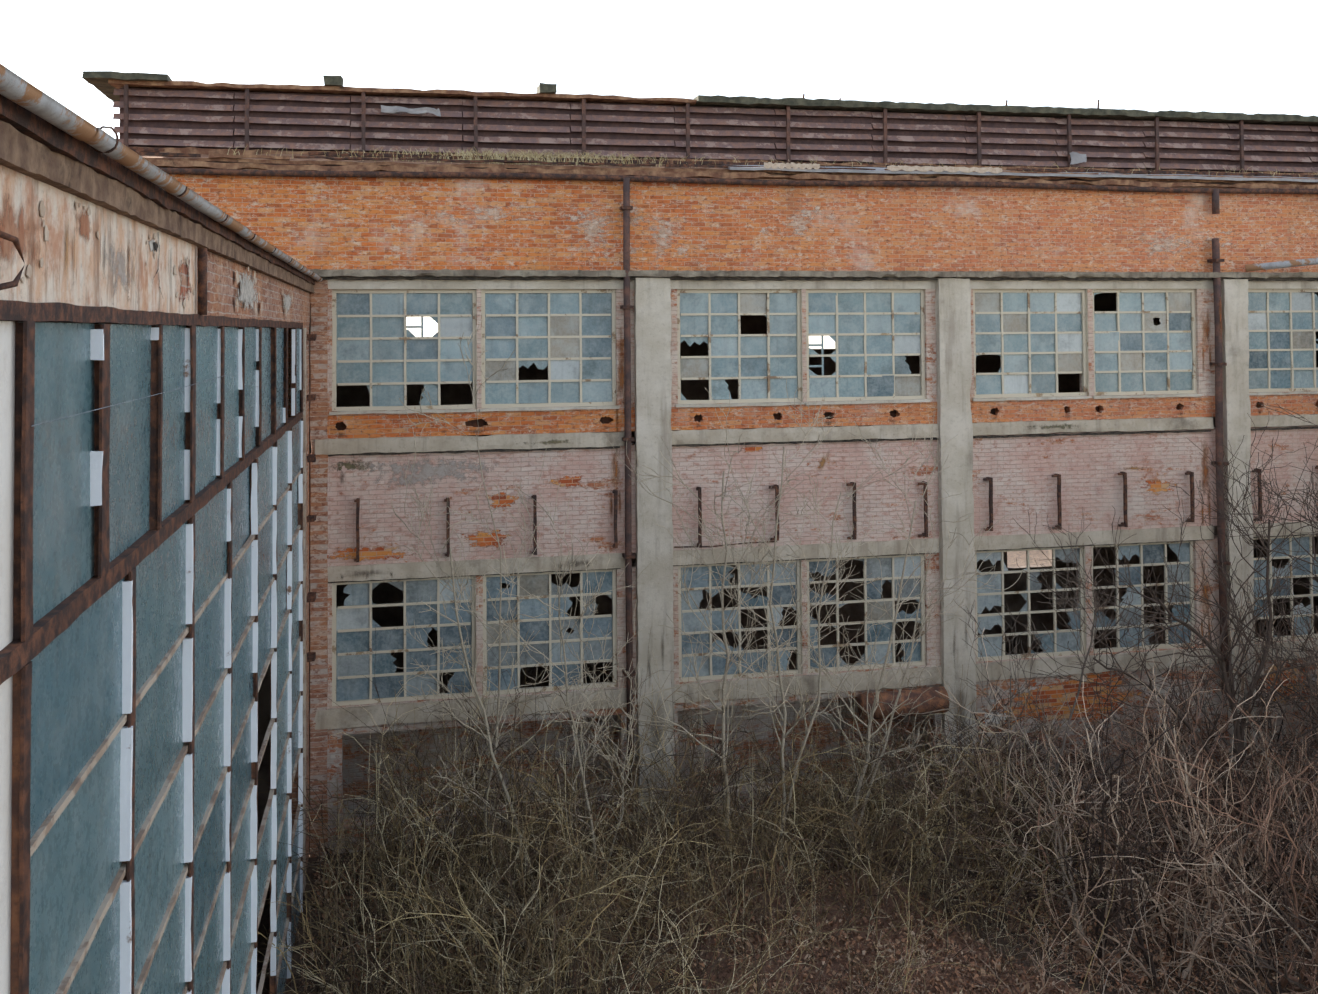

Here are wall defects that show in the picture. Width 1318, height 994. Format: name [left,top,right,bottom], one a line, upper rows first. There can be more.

flaking render [235,266,263,314]
corrosion [1202,302,1222,369]
flaking render [461,491,518,550]